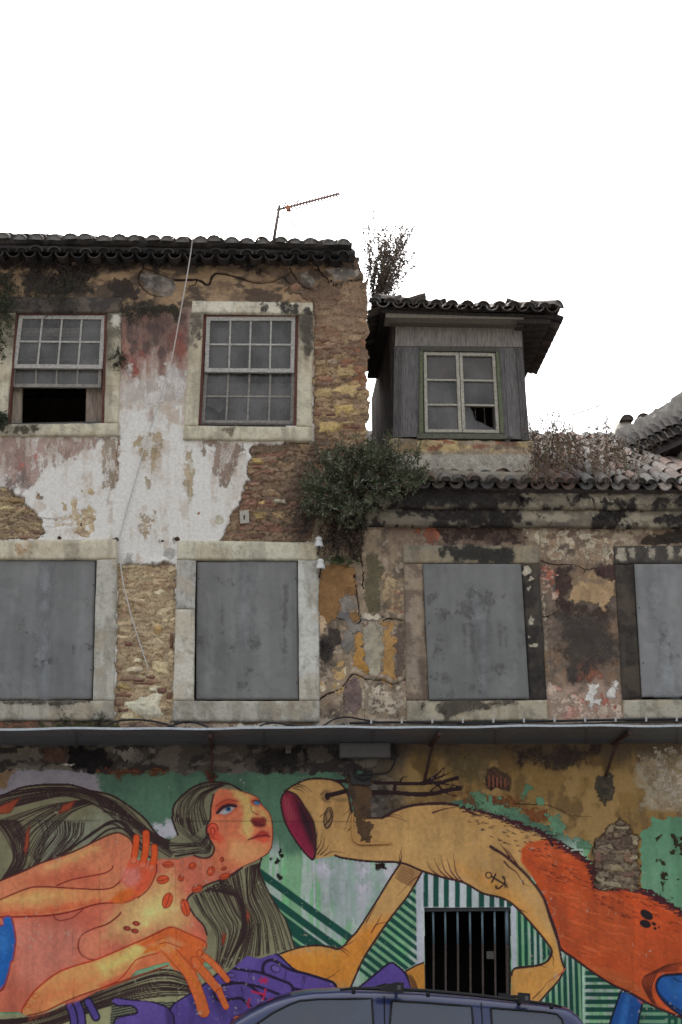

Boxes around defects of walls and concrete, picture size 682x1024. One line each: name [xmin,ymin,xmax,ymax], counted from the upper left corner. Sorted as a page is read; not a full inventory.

crack [128,261,361,297]
flaking render [221,278,371,542]
flaking render [0,487,97,540]
peeling [518,528,618,668]
flaking render [114,563,285,728]
flaking render [318,562,407,720]
peeling [546,681,623,723]
peeling [459,783,566,836]
peeling [636,745,682,814]
flaking render [573,820,640,892]